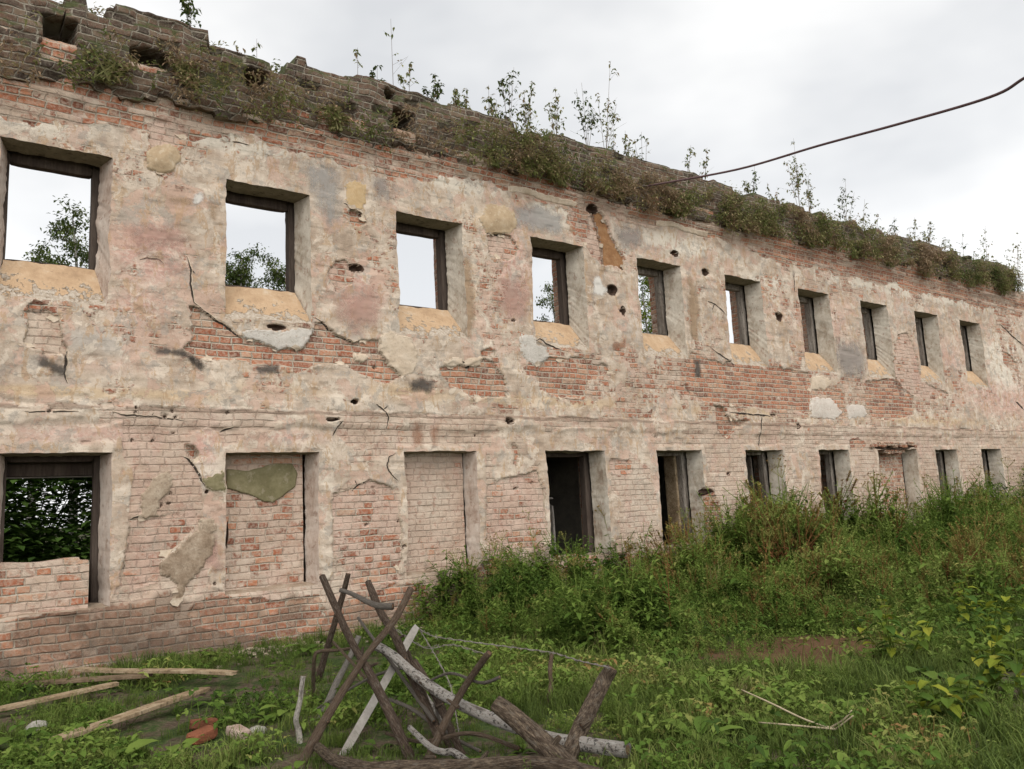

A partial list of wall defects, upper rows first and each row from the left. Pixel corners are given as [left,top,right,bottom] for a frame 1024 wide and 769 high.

crack [140,256,242,339]
crack [61,351,69,383]
crack [183,456,206,488]
flaking render [184,443,207,464]
flaking render [181,304,418,384]
crack [351,453,399,491]
crack [376,403,390,427]
flaking render [519,335,615,400]
flaking render [680,351,914,439]
flaking render [123,473,327,640]
flaking render [331,479,431,613]
flaking render [475,445,550,586]